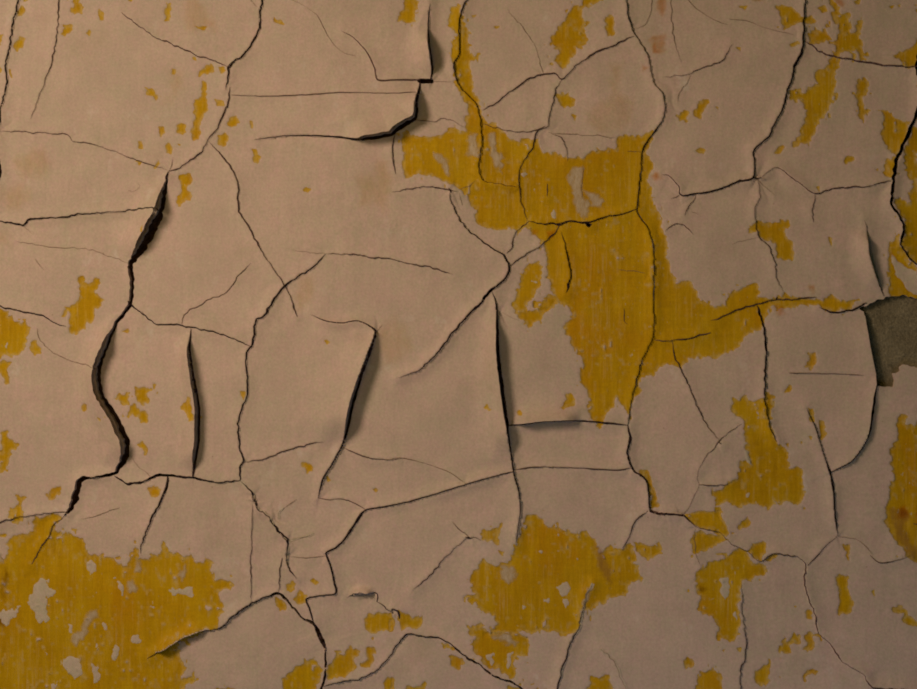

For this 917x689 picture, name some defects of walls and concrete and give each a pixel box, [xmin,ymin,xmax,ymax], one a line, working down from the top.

crack [0,0,19,122]
crack [1,208,142,248]
peeling [314,0,917,468]
crack [667,0,917,442]
peeling [0,494,239,689]
peeling [282,610,423,689]
crack [31,0,696,689]
peeling [441,510,663,689]
crack [631,332,741,476]
peeling [685,385,806,652]
crack [700,386,883,689]
peeling [883,414,917,563]